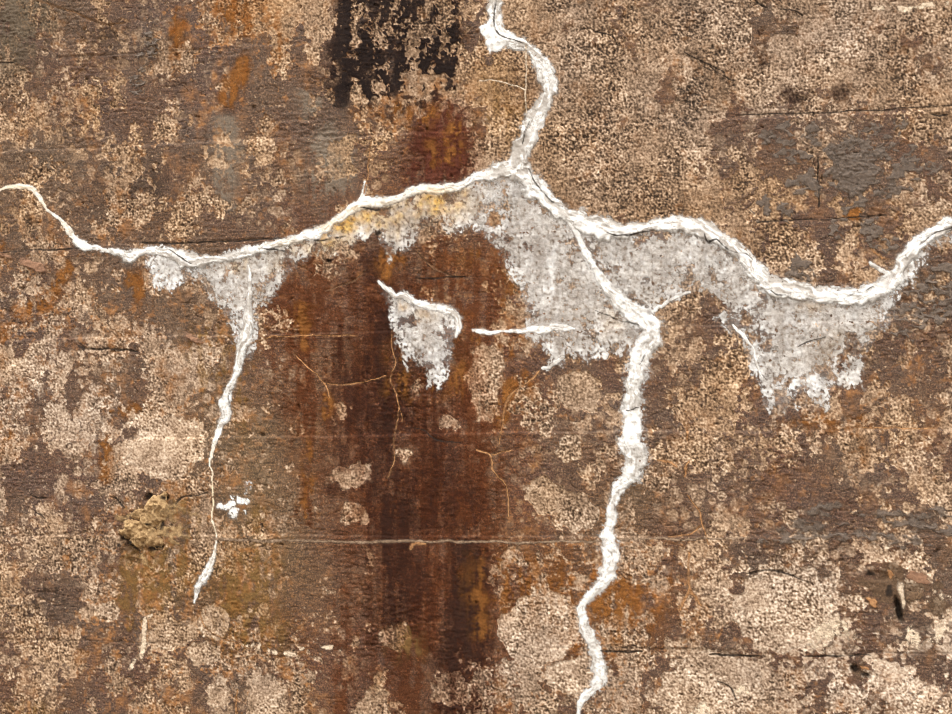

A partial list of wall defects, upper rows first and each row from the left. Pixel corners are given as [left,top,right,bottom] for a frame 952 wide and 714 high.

crack [684,52,733,81]
crack [0,0,558,269]
rust [395,104,467,186]
crack [744,105,952,117]
rust [381,251,395,278]
crack [416,250,467,279]
leakage [145,177,952,414]
crack [77,344,138,352]
crack [252,334,540,517]
crack [508,157,952,714]
rust [571,570,643,623]